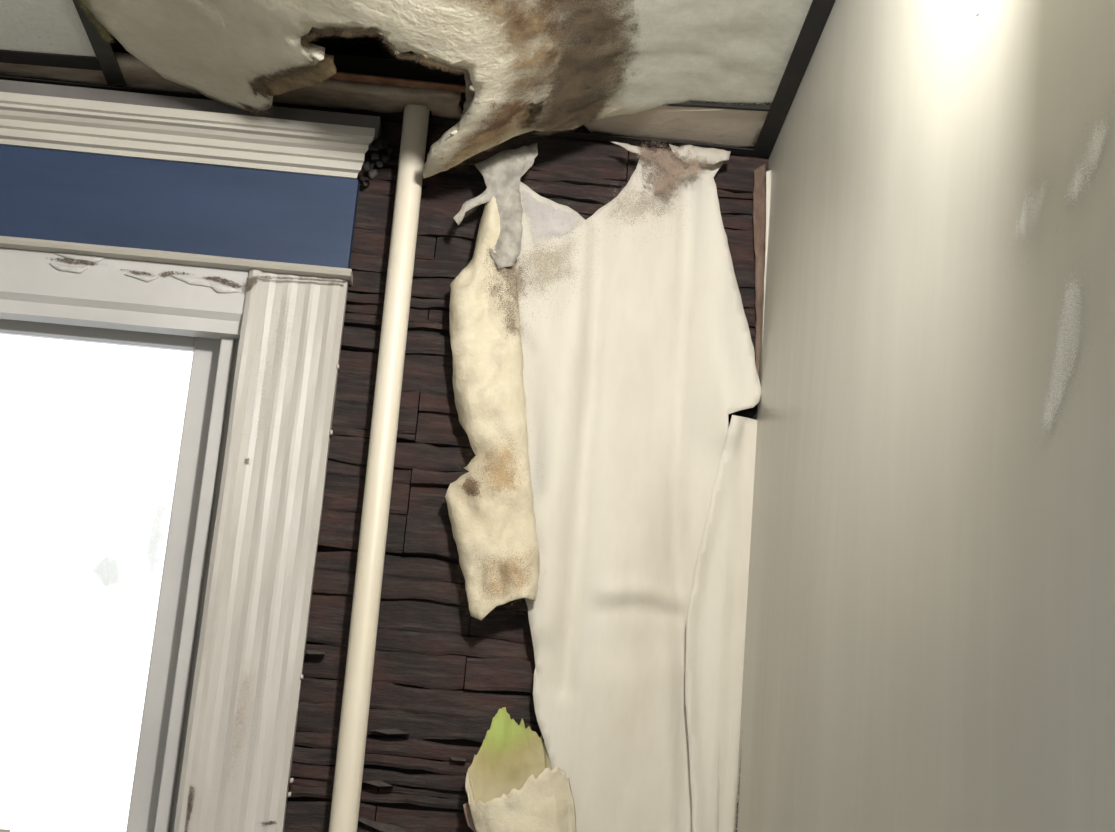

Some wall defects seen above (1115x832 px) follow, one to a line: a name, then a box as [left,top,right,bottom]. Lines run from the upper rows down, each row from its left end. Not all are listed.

spalling [253,54,337,96]
damp [239,26,471,118]
spalling [463,69,479,115]
damp [432,0,649,171]
spalling [363,135,393,187]